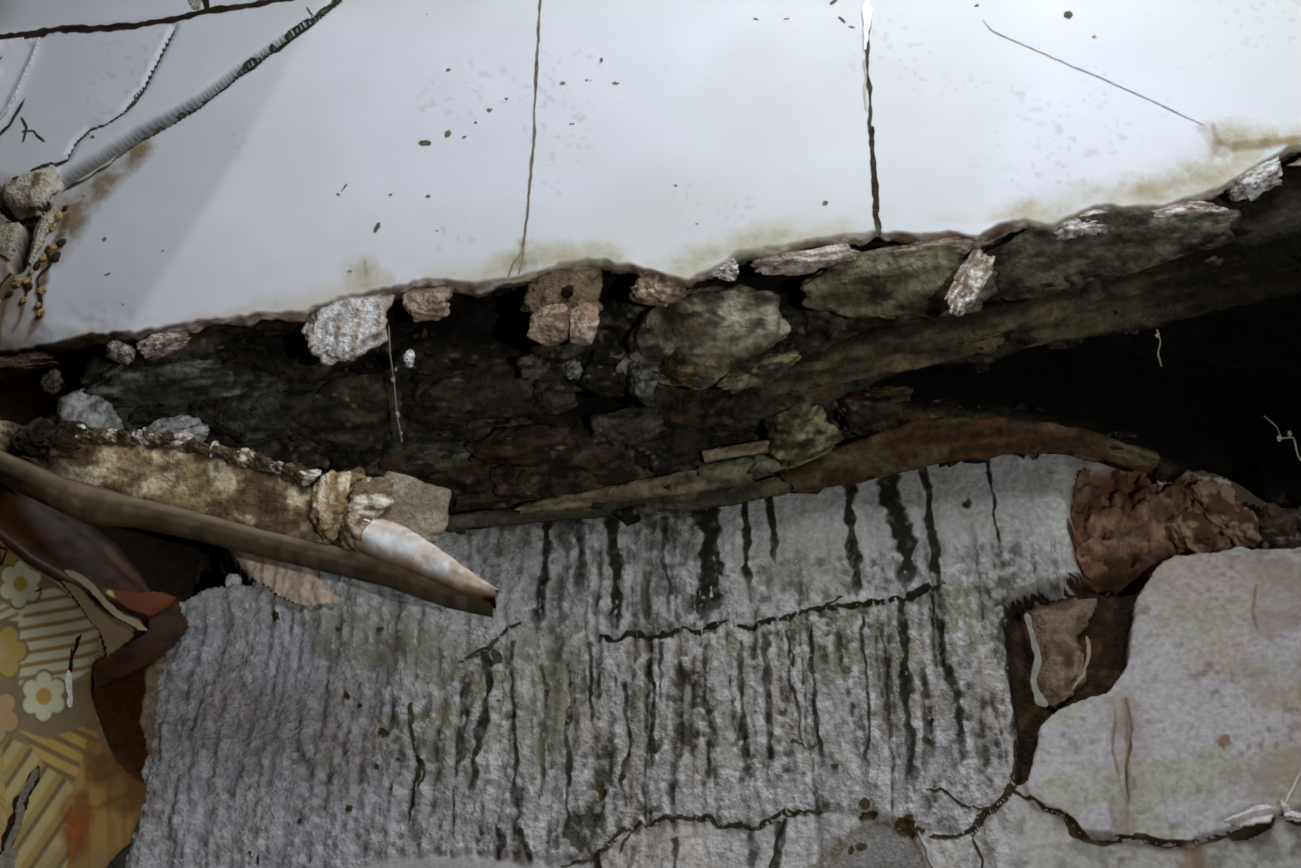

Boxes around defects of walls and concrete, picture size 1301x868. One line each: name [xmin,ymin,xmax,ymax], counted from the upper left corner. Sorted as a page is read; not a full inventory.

crack [0,0,342,289]
crack [508,0,542,277]
crack [862,0,882,236]
leakage [604,517,624,627]
leakage [691,507,725,615]
crack [599,582,946,643]
leakage [843,484,863,591]
leakage [859,467,965,779]
leakage [459,651,494,789]
leakage [618,641,664,791]
crack [561,808,829,868]
crack [924,697,1237,868]